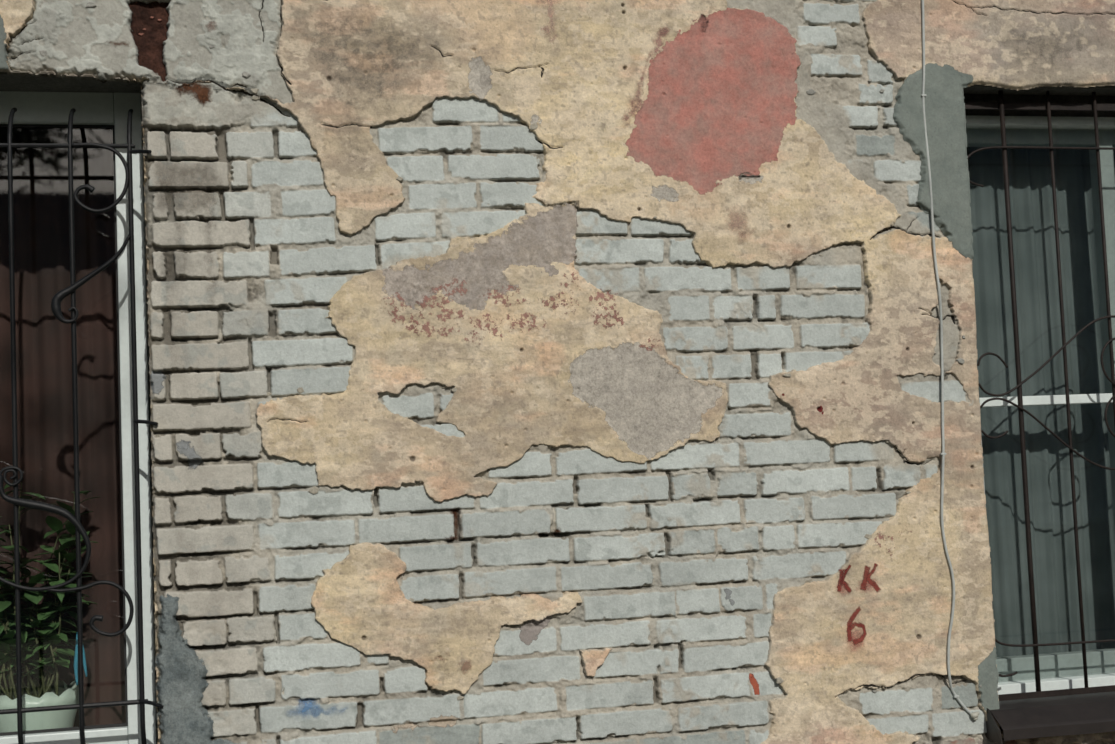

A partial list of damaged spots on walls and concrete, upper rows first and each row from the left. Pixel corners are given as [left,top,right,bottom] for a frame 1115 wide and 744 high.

crack [170,0,292,117]
crack [952,0,1115,16]
peeling [625,0,946,239]
spalling [897,280,974,407]
spalling [378,383,465,437]
spalling [838,674,1018,744]